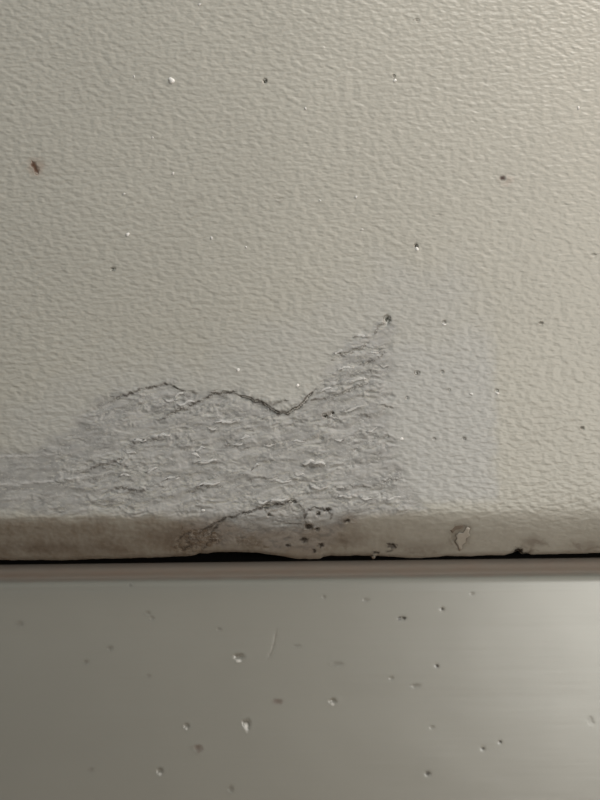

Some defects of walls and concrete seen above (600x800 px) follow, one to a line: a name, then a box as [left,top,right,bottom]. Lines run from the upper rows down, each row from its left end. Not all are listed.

crack [108,381,320,421]
peeling [64,314,432,558]
crack [197,498,334,537]
peeling [446,521,475,551]